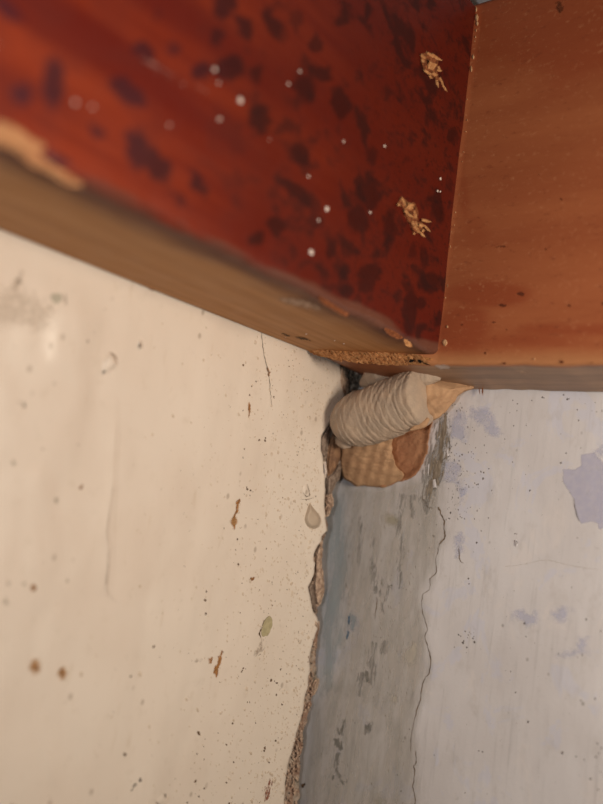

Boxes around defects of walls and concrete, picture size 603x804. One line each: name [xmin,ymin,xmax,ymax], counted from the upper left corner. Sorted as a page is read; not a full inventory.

peeling [563,453,603,529]
crack [410,507,446,804]